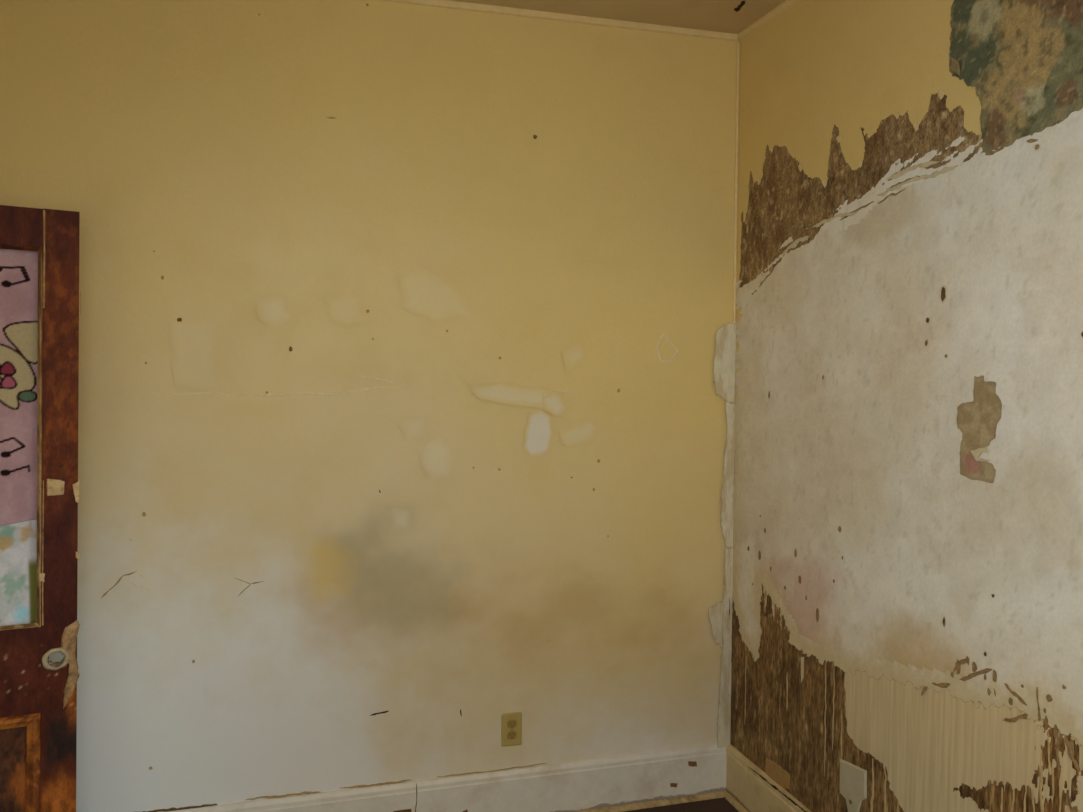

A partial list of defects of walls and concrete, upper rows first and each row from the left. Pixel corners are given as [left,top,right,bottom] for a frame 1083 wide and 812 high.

leakage [270,323,990,751]
flaking render [730,89,1083,812]